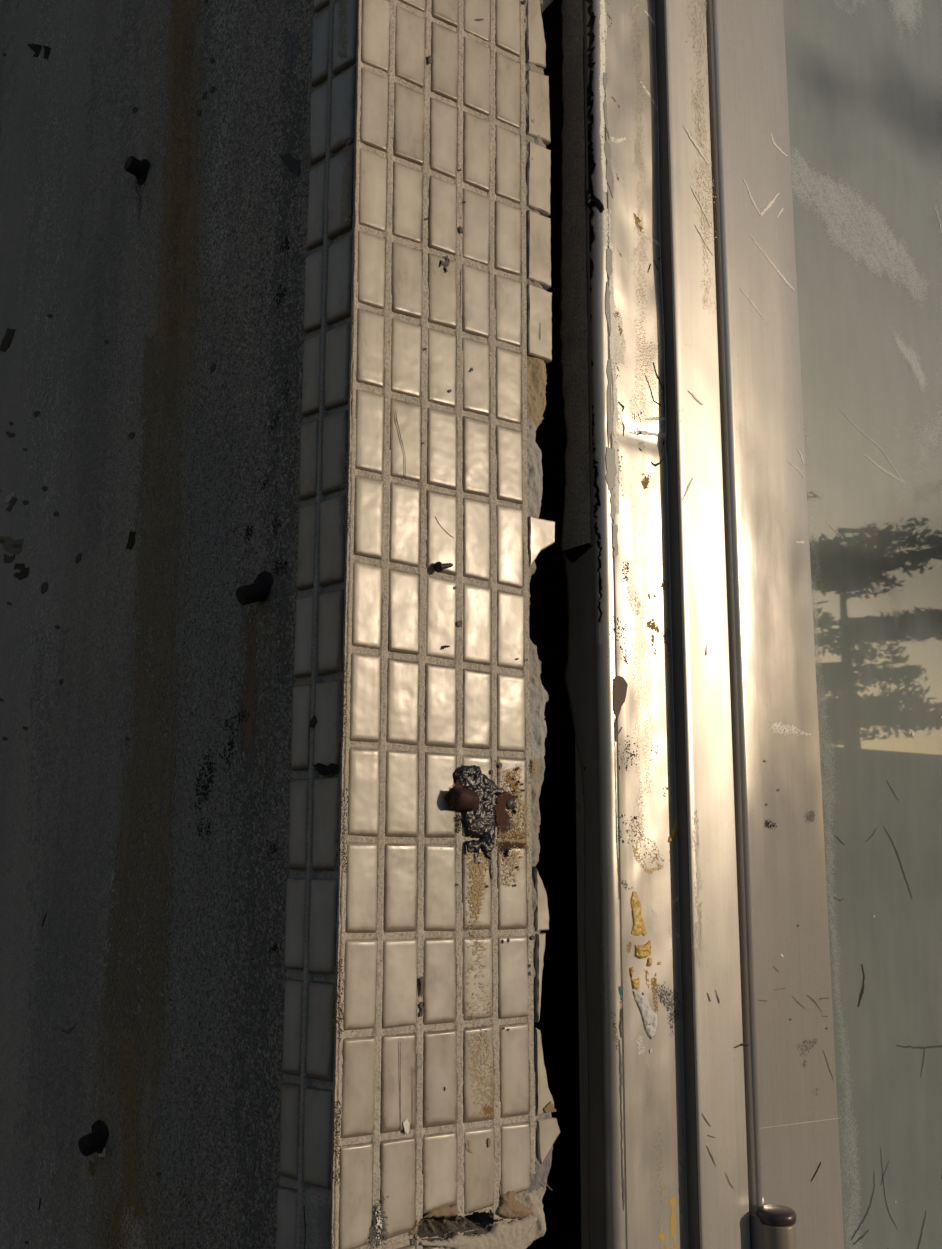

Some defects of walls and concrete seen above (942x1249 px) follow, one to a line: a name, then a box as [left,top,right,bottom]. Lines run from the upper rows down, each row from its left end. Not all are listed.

spalling [414,638,560,1249]
rust [457,759,539,1120]